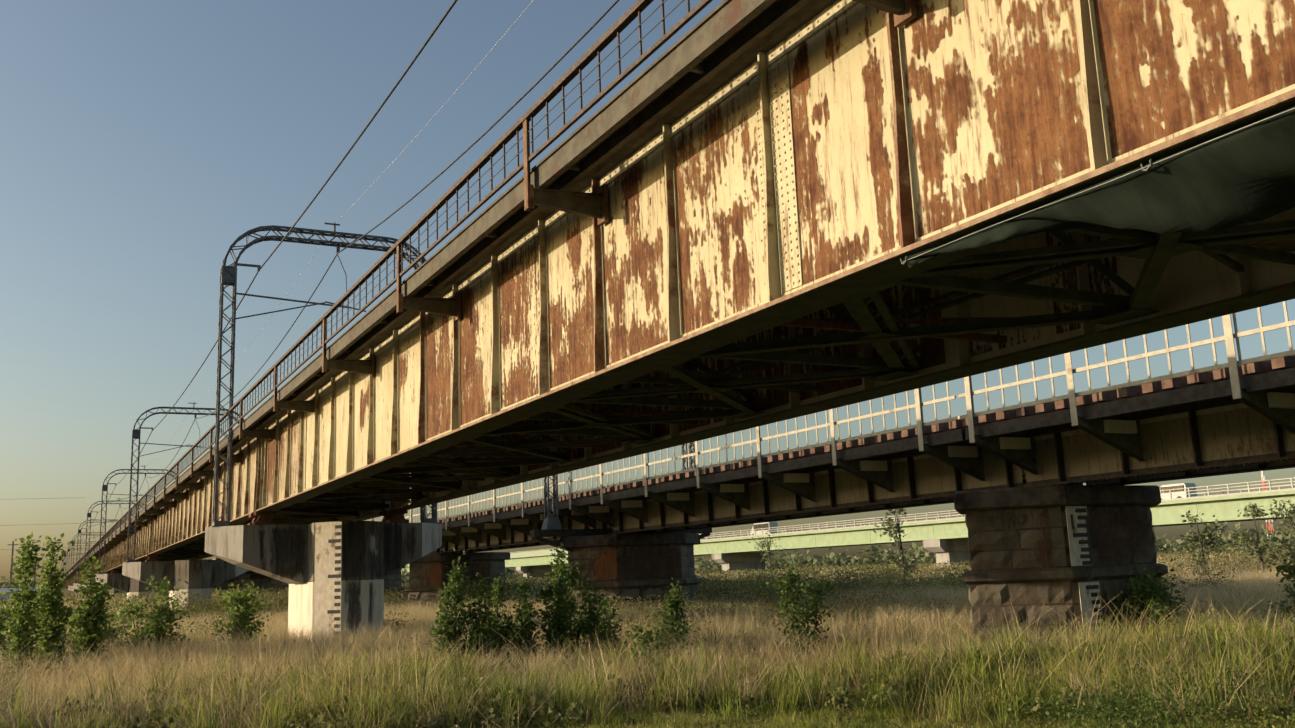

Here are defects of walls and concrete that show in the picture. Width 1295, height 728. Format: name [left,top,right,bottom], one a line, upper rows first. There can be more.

corrosion [790,9,900,290]
corrosion [905,0,1091,238]
corrosion [1093,0,1295,159]
corrosion [399,82,765,439]
corrosion [267,411,324,503]
corrosion [360,378,387,428]
damp [270,525,306,578]
damp [343,520,402,644]